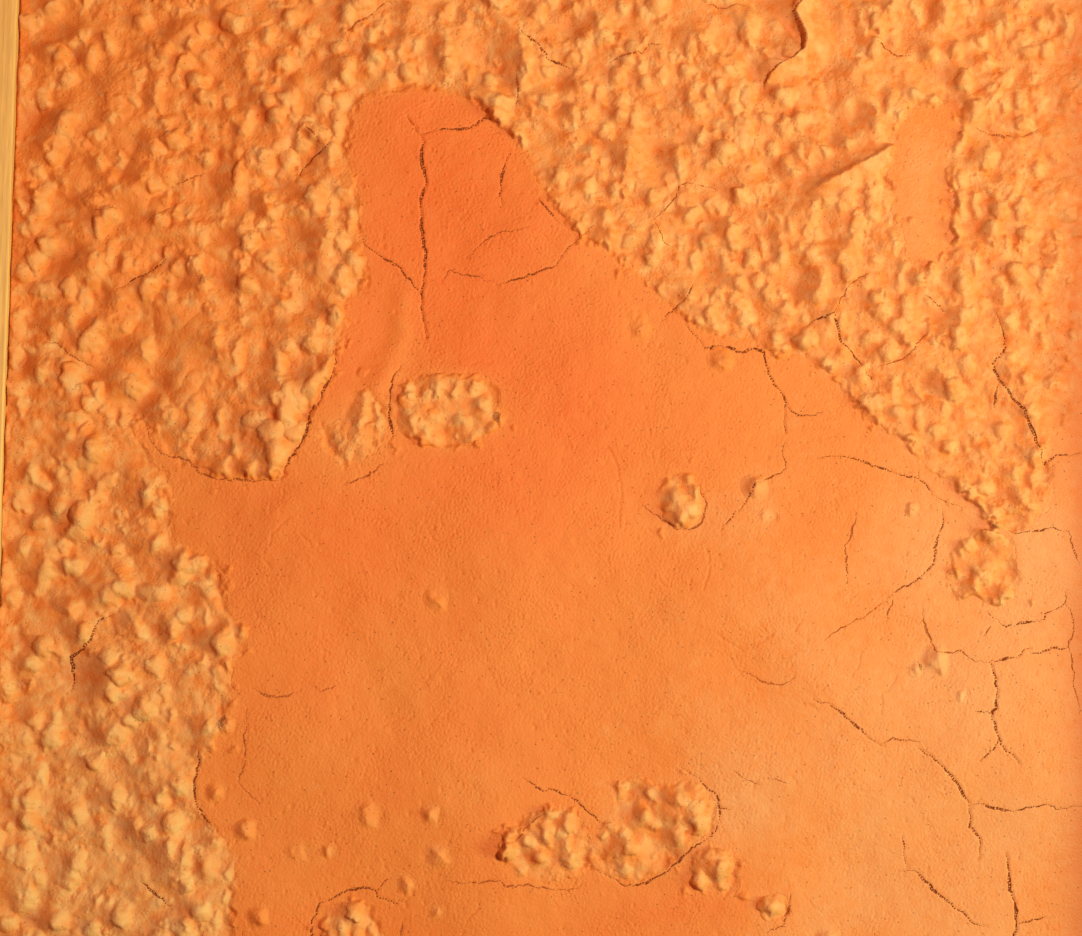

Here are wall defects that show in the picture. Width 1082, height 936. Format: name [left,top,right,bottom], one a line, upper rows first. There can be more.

crack [519,27,567,67]
peeling [765,0,843,88]
crack [363,76,591,337]
crack [642,287,816,530]
crack [992,315,1078,465]
crack [821,456,962,638]
crack [923,594,1080,762]
crack [515,777,603,842]
crack [596,765,729,886]
crack [898,839,982,926]
crack [817,701,1081,852]
crack [1006,855,1053,936]